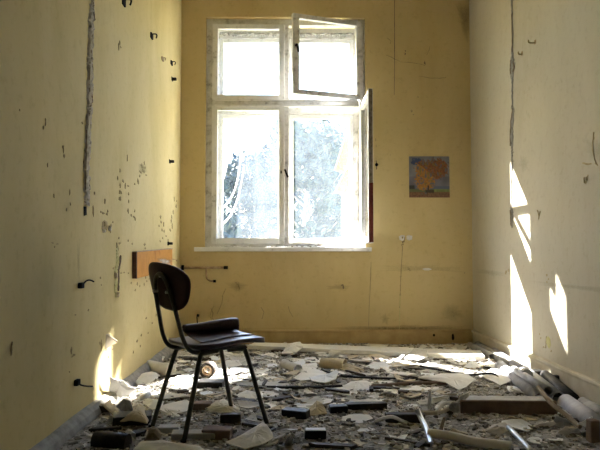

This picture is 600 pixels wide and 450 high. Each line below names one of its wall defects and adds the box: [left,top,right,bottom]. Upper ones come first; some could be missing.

crack [509,0,517,228]
spalling [84,199,113,233]
peeling [113,237,129,298]